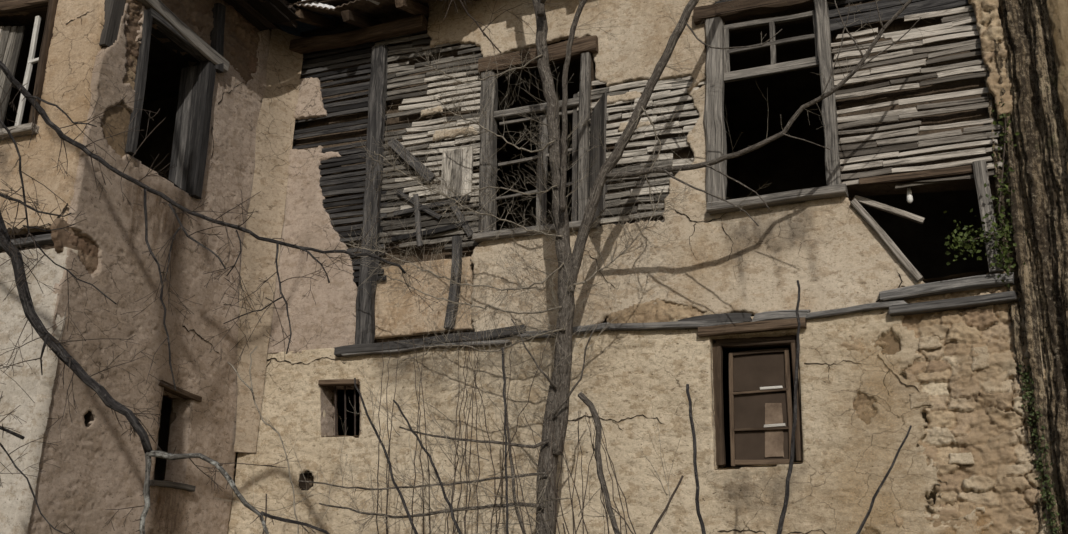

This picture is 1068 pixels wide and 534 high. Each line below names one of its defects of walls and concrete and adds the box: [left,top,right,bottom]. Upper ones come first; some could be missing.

peeling [292,25,483,283]
peeling [577,75,706,227]
peeling [50,218,99,274]
spalling [607,297,714,338]
spalling [828,0,1068,534]